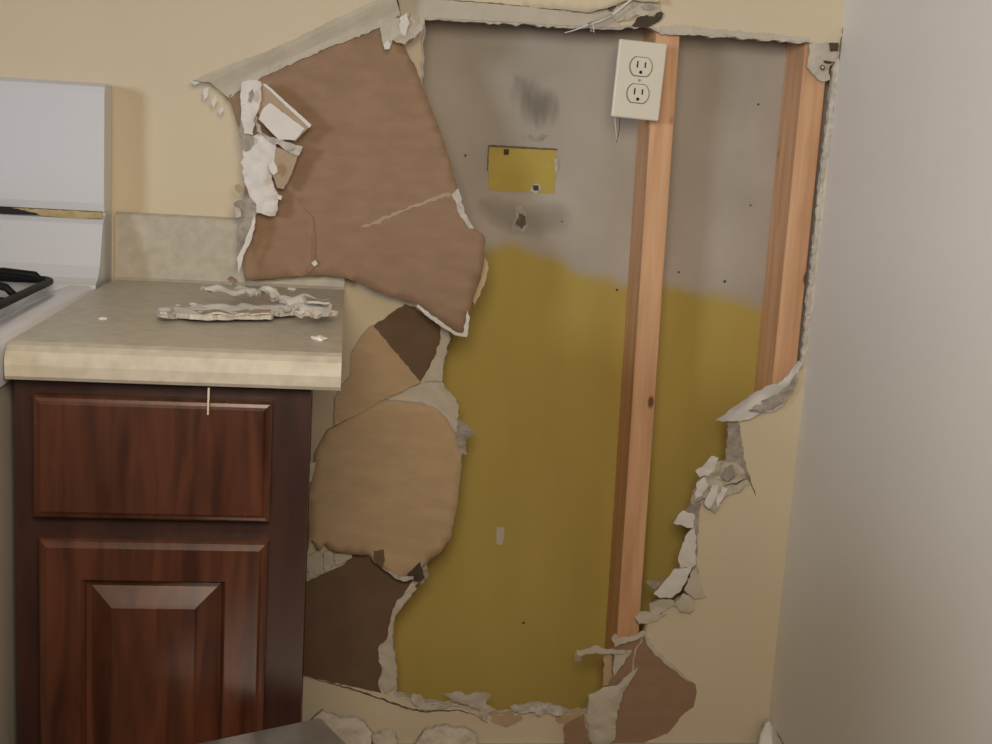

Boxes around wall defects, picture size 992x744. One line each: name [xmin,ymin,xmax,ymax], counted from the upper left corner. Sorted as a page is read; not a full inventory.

spalling [231,15,397,97]
spalling [303,20,697,744]
spalling [640,25,840,612]